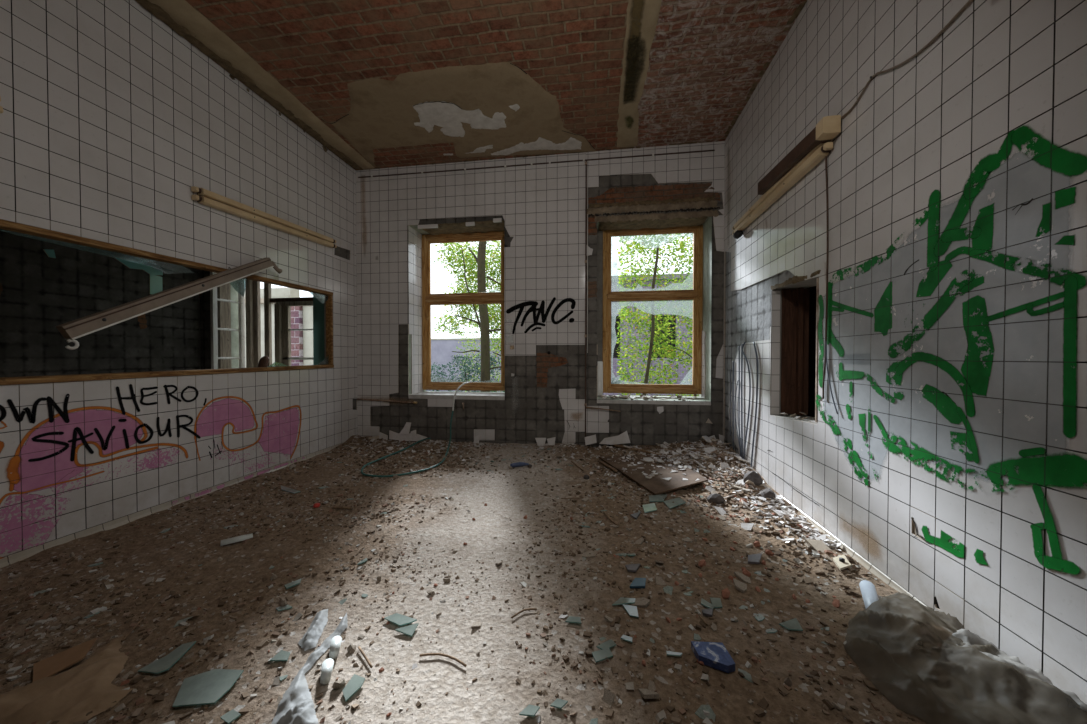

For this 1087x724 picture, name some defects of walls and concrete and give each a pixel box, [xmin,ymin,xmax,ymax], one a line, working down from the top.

peeling [413,101,520,137]
peeling [415,137,641,165]
spalling [370,174,799,454]